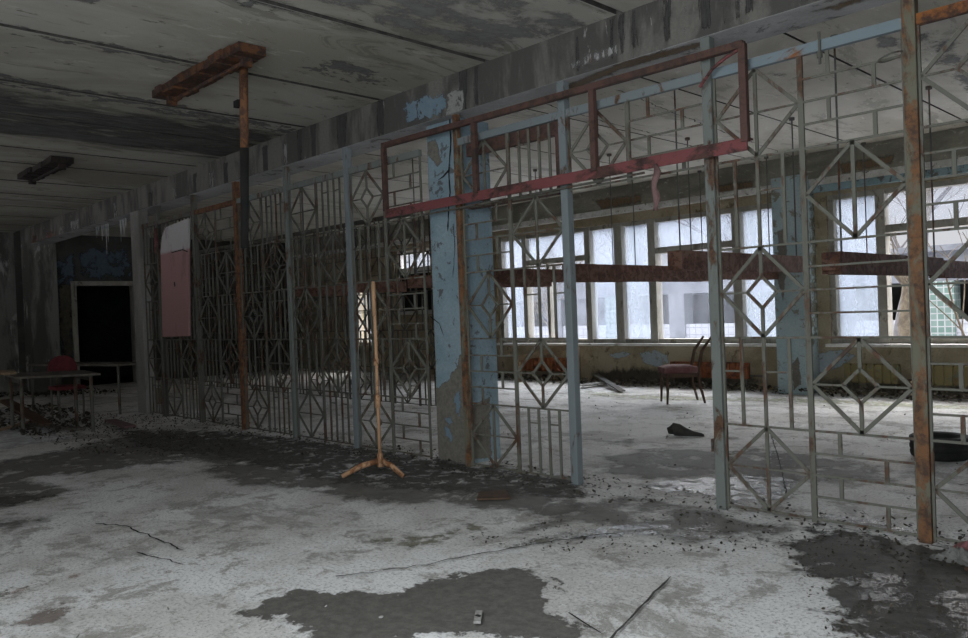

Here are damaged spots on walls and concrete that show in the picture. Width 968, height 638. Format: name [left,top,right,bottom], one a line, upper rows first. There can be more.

damp [319,0,639,71]
damp [663,0,671,41]
peeling [403,90,464,123]
damp [0,436,583,516]
damp [235,568,591,638]
crack [568,576,671,638]